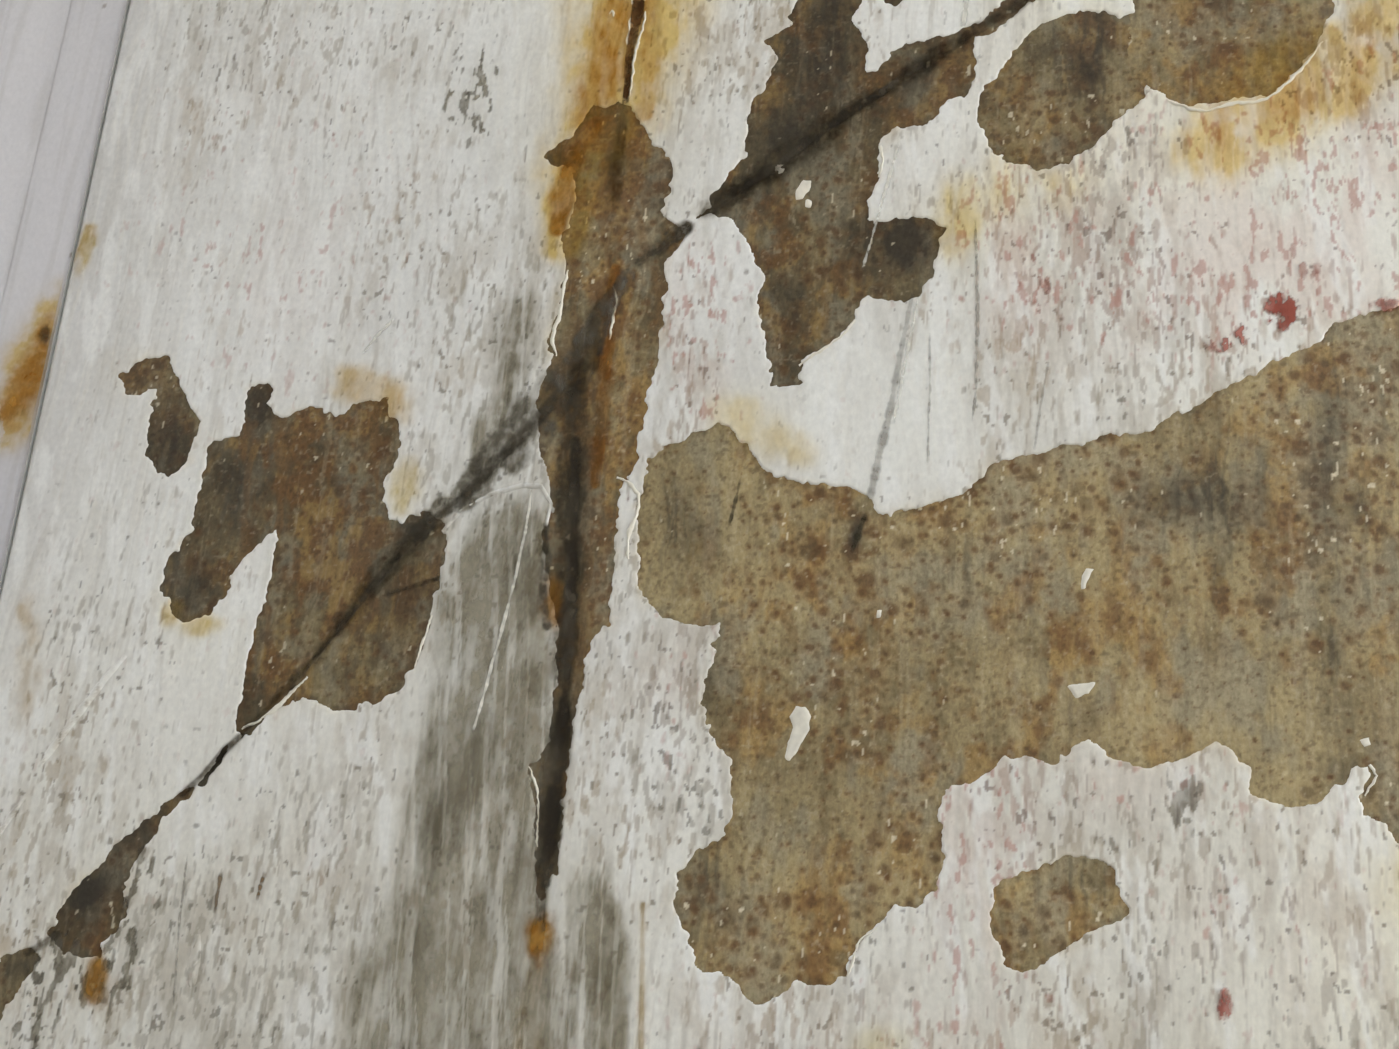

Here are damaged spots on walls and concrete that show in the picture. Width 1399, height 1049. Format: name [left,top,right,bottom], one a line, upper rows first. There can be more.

crack [606,0,647,103]
crack [721,67,921,205]
peeling [696,0,1335,387]
rust [0,327,49,418]
crack [415,221,693,887]
peeling [528,101,1399,1005]
peeling [47,355,447,958]
crack [200,737,242,776]
peeling [0,948,41,1020]